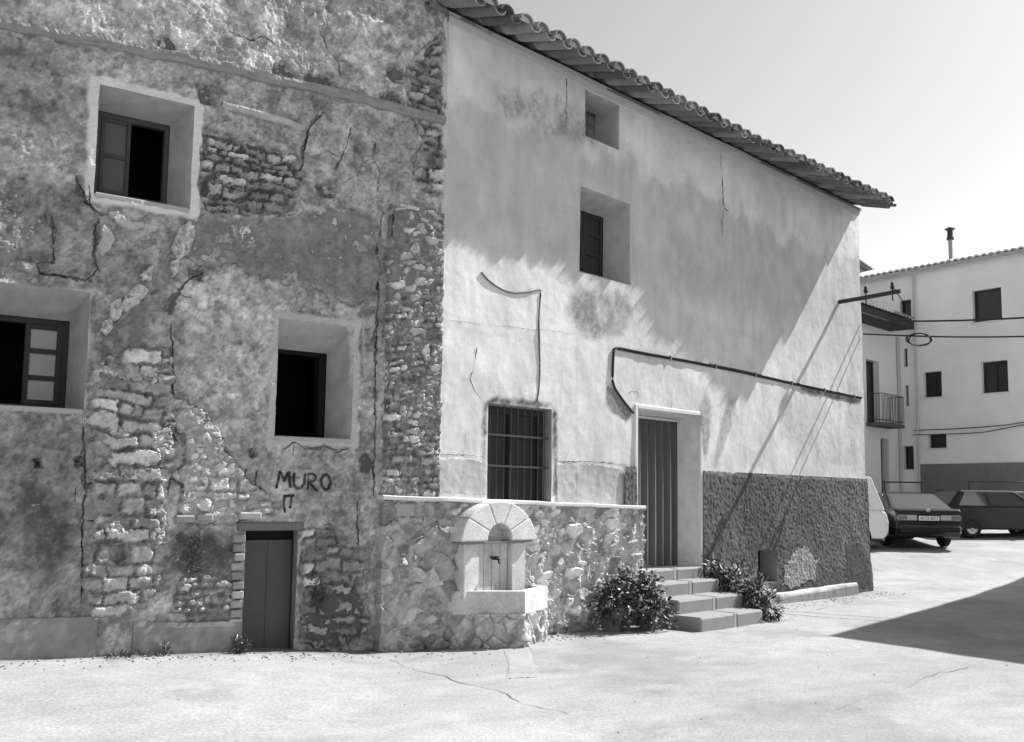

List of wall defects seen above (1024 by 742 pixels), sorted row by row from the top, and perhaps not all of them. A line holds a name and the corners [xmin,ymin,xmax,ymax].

crack [35,175,105,283]
peeling [97,211,144,256]
peeling [185,126,381,306]
crack [283,112,383,545]
water stain [573,292,627,334]
flaking render [91,364,277,524]
crack [75,420,94,605]
flaking render [103,520,125,533]
flaking render [149,525,166,545]
flaking render [167,571,237,615]
flaking render [298,523,372,652]